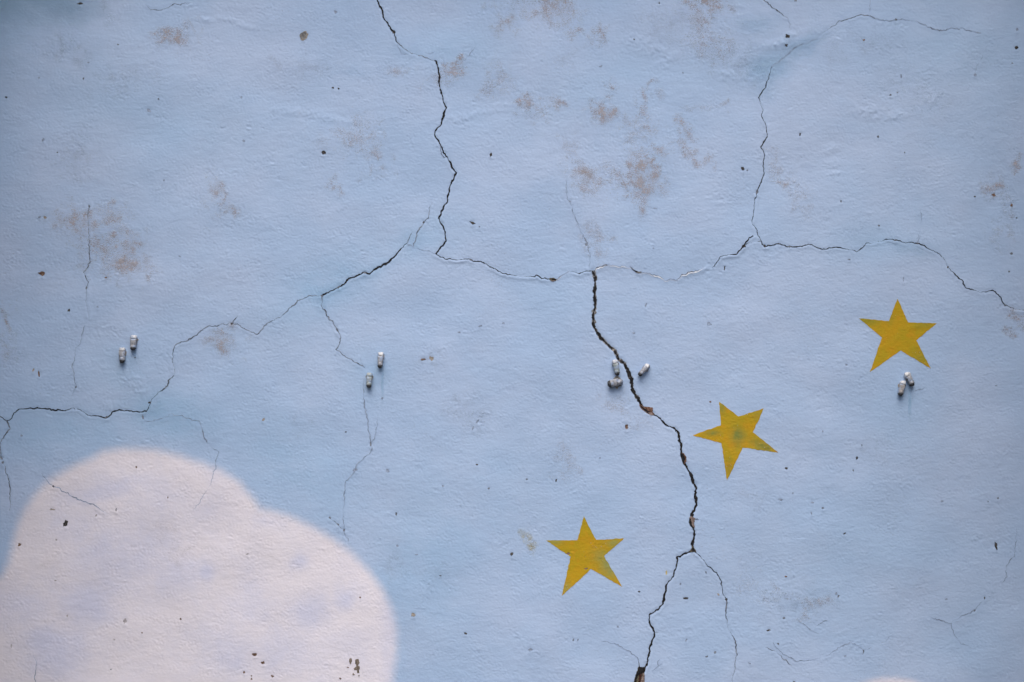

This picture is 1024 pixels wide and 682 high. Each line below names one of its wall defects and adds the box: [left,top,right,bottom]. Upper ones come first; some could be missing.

crack [0,0,981,514]
crack [887,212,1020,310]
crack [331,389,378,541]
crack [602,413,738,678]
crack [766,620,891,666]